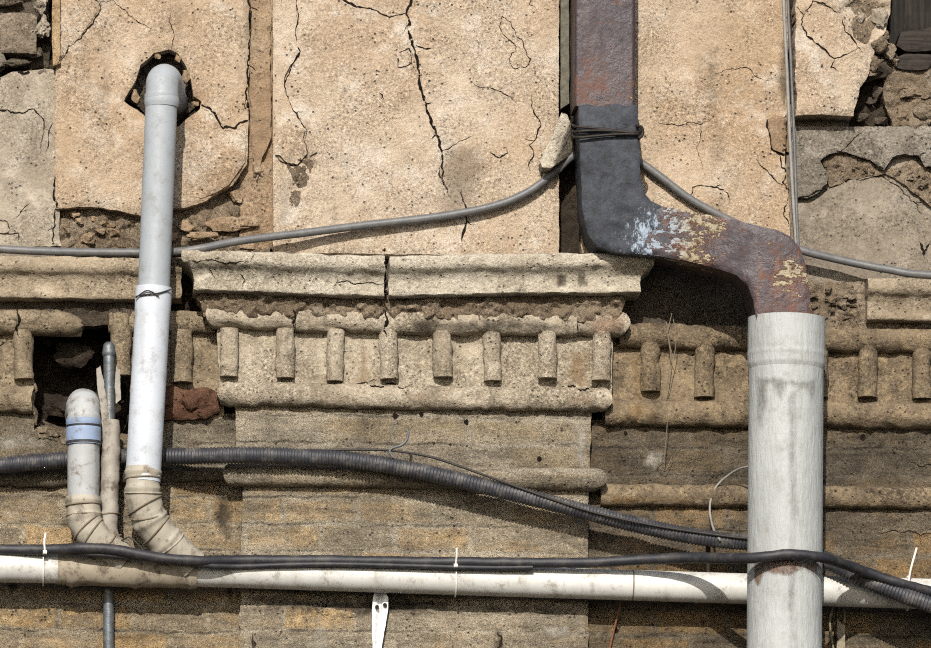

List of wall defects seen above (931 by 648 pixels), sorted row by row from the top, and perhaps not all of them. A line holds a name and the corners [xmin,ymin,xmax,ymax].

crack [0,0,175,75]
crack [201,0,259,131]
crack [277,0,308,166]
crack [343,0,472,241]
crack [474,84,541,170]
spalling [844,0,931,128]
crack [48,178,59,243]
spalling [57,209,141,248]
spalling [172,161,270,252]
spalling [822,153,931,208]
crack [336,248,389,337]
spalling [32,408,66,444]